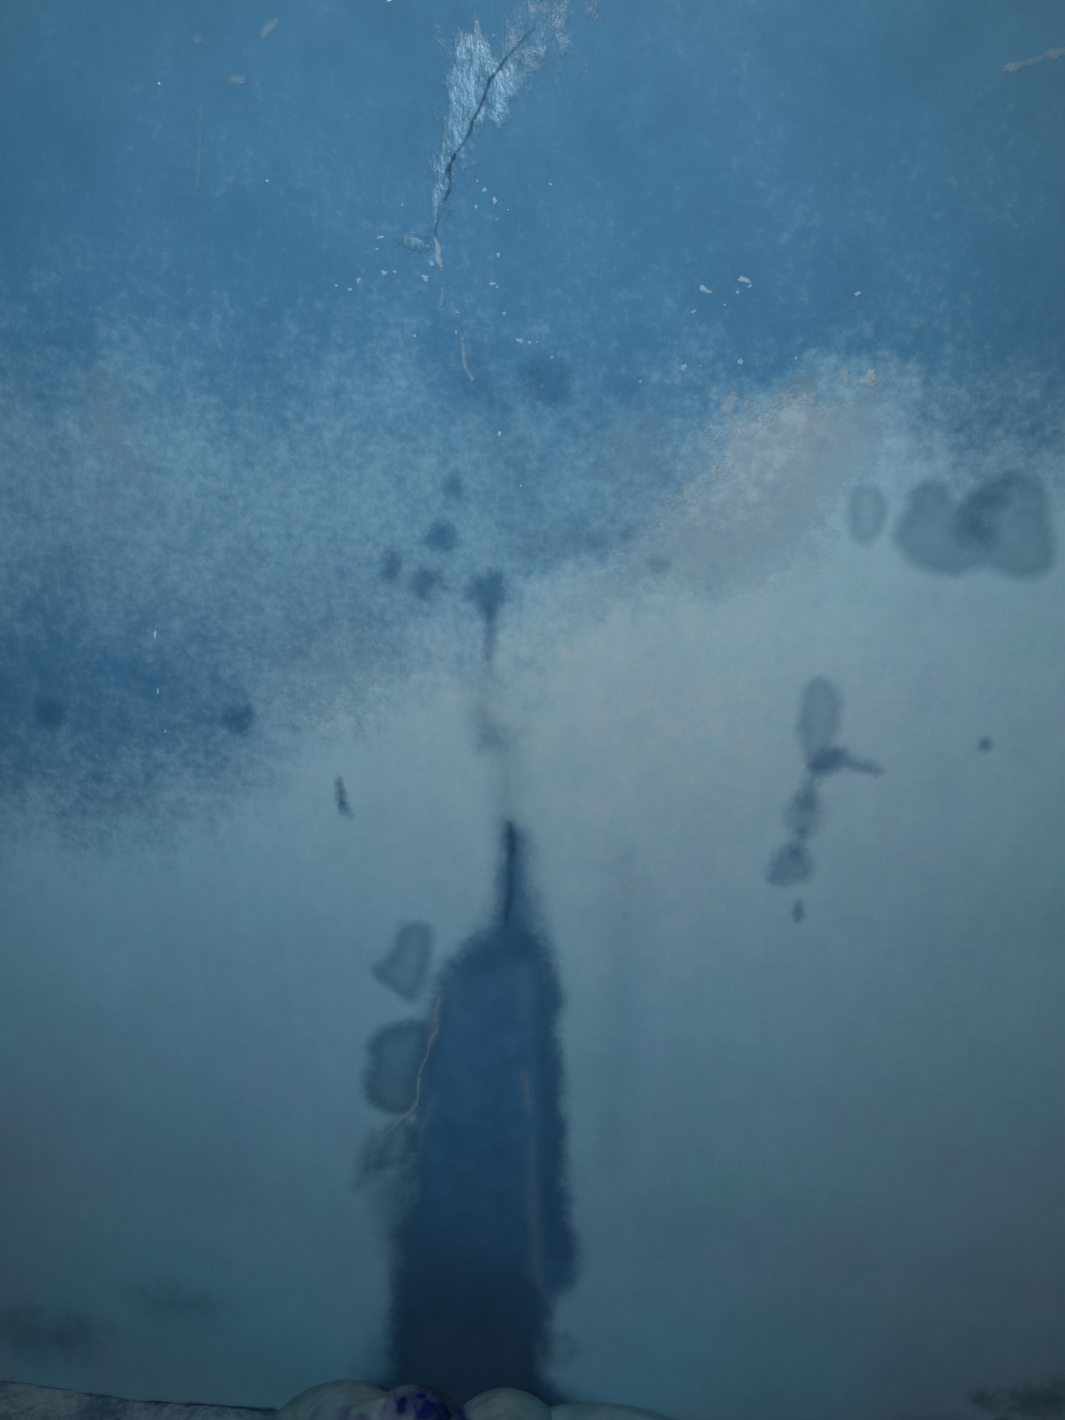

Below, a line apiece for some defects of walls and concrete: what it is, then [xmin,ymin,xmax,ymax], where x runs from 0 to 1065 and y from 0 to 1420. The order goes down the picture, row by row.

crack [447,51,512,172]
crack [434,237,442,268]
damp [368,841,575,1417]